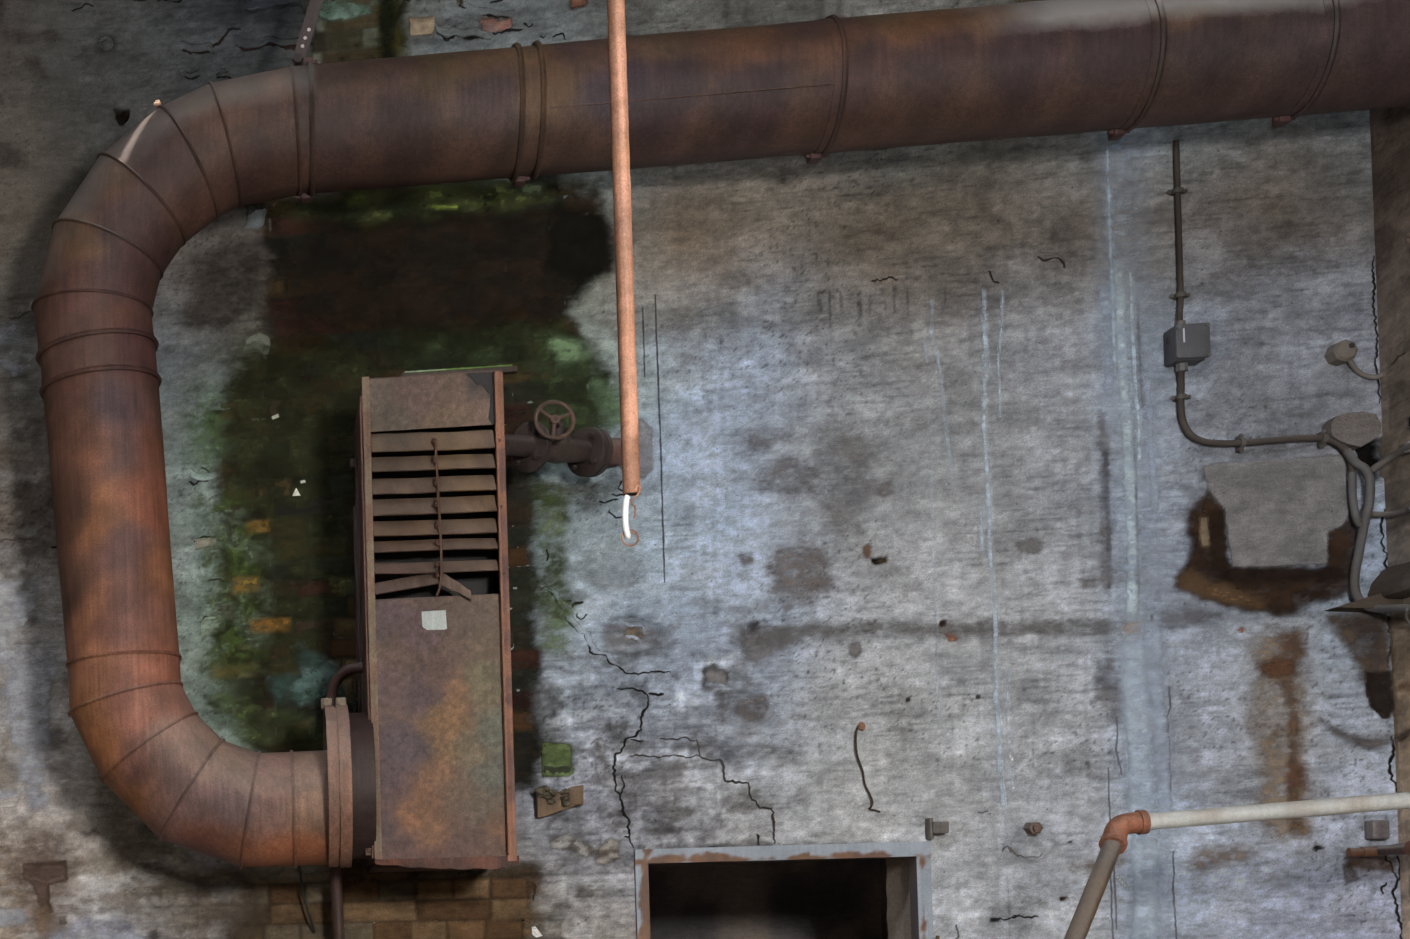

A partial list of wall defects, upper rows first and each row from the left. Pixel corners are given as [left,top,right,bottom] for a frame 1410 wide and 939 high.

flaking render [298,0,435,64]
spalling [457,0,515,33]
leakage [552,208,615,279]
leakage [187,249,265,328]
mould [268,649,346,704]
crack [539,550,776,848]
crack [1001,913,1039,921]
crack [1380,855,1403,939]